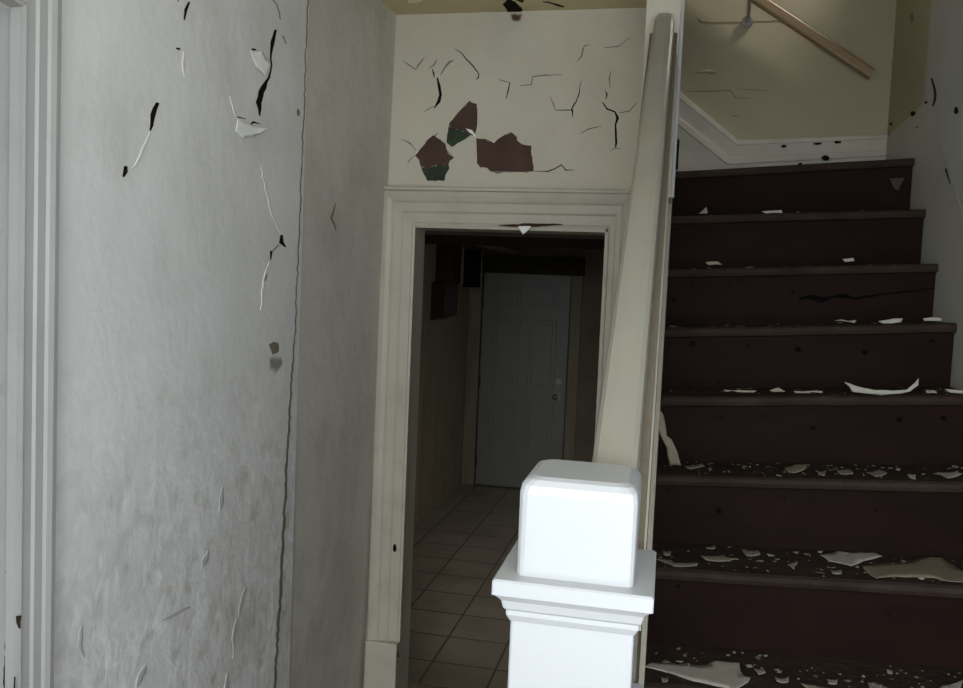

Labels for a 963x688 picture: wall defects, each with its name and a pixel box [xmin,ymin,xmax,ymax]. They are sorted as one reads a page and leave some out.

flaking render [503,0,524,12]
peeling [229,96,268,138]
peeling [401,101,534,181]
crack [404,37,636,151]